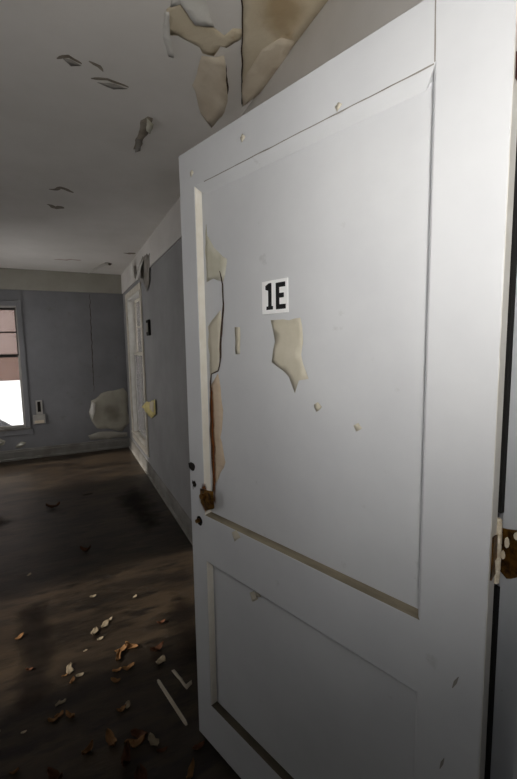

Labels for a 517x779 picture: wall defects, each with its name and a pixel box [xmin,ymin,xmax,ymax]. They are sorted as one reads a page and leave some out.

peeling [163,0,328,128]
peeling [134,117,154,152]
peeling [205,227,227,282]
peeling [271,318,308,392]
peeling [88,388,129,440]